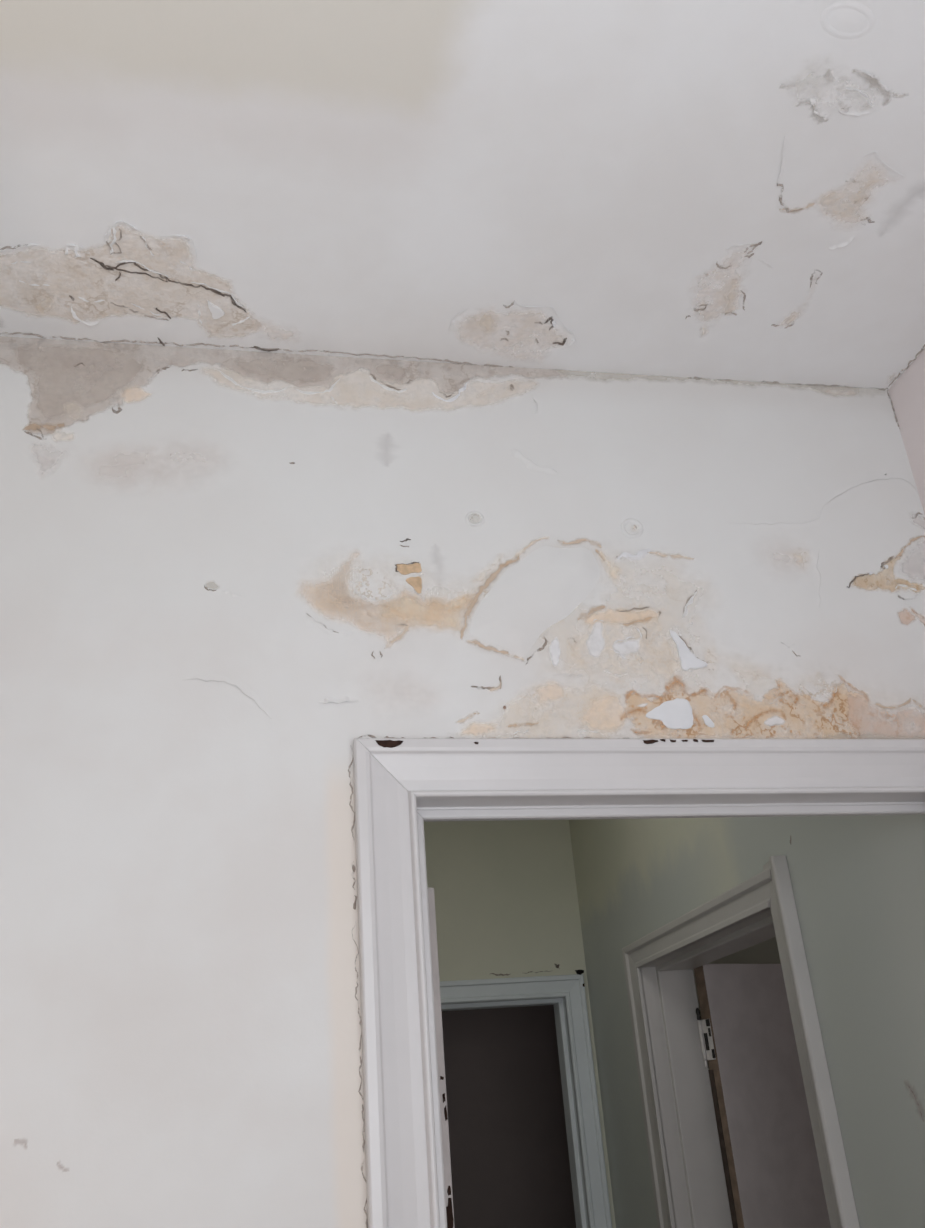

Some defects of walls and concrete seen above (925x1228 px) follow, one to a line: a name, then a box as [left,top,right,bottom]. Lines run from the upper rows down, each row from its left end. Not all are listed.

flaking render [810,66,893,120]
peeling [0,221,576,439]
peeling [395,562,422,594]
peeling [550,606,708,679]
peeling [446,1186,454,1228]